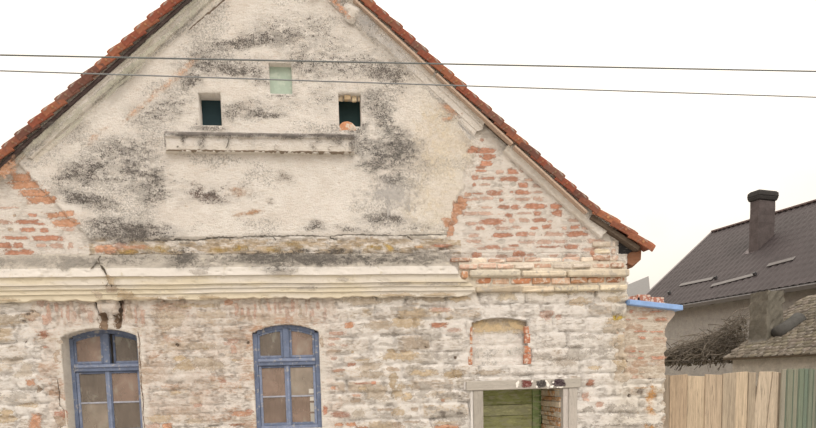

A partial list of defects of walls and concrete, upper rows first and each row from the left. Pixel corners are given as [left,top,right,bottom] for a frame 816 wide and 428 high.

leakage [3,11,473,274]
flaking render [0,156,80,255]
flaking render [415,138,604,258]
flaking render [0,303,70,363]
crack [91,256,124,316]
peeling [87,275,257,330]
peeling [165,338,241,371]
peeling [319,282,470,428]
peeling [497,291,666,397]
peeling [0,356,43,428]
flaking render [230,409,253,426]
spalling [582,365,663,428]